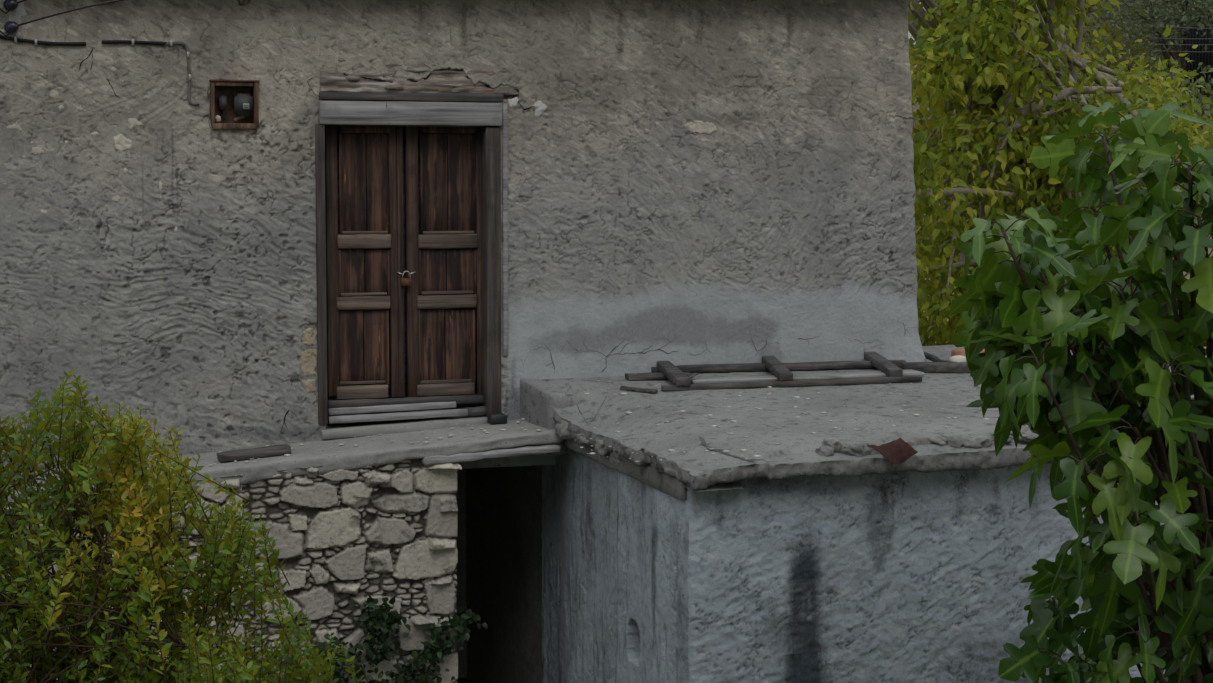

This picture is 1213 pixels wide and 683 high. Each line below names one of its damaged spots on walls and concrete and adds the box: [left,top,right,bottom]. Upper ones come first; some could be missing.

spalling [339,65,520,107]
peeling [533,101,547,118]
crack [523,337,710,424]
rust [867,438,918,465]
damp [787,549,822,683]